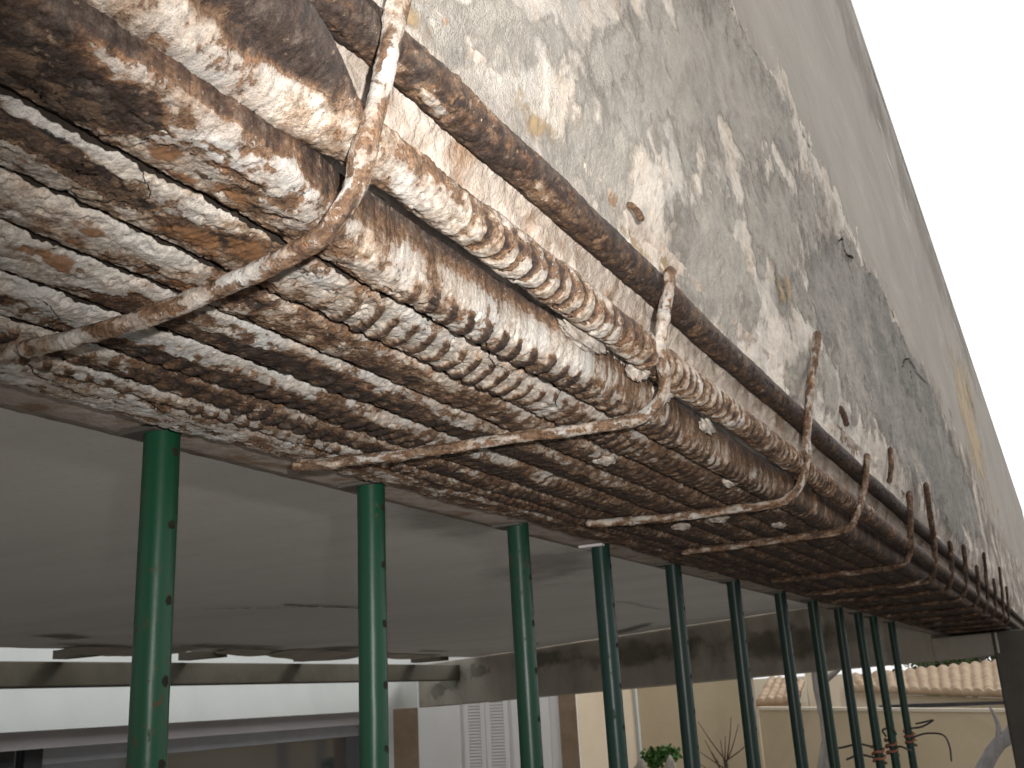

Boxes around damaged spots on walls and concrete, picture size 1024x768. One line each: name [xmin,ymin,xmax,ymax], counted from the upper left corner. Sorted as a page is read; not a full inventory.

rust [521,91,552,137]
rust [148,140,196,184]
spalling [0,0,386,343]
rust [210,182,247,204]
rust [16,245,74,274]
rust [74,221,104,237]
rust [161,225,268,261]
rust [172,279,198,290]
spalling [0,124,658,460]
spalling [333,0,1024,636]
peeling [56,646,132,656]
peeling [172,647,358,661]